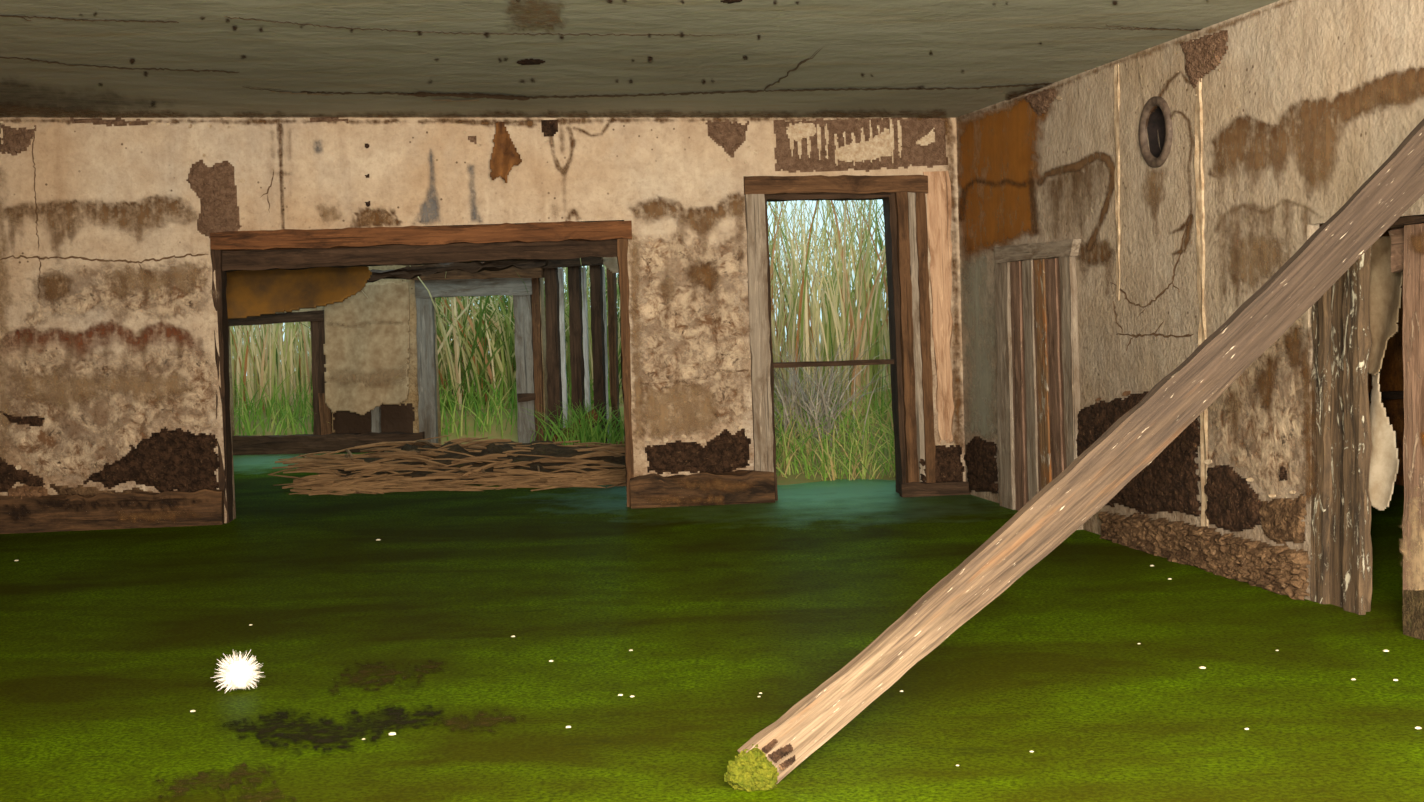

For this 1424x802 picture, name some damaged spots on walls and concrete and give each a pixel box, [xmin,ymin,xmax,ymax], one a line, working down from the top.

flaking render [0,121,36,158]
water stain [0,195,201,343]
peeling [0,348,220,496]
flaking render [186,153,245,238]
water stain [0,83,1115,265]
peeling [630,228,751,474]
flaking render [698,117,998,493]
flaking render [1076,391,1149,457]
crack [1110,213,1193,351]
water stain [1145,73,1194,172]
flaking render [1098,318,1310,601]
water stain [1209,67,1424,186]